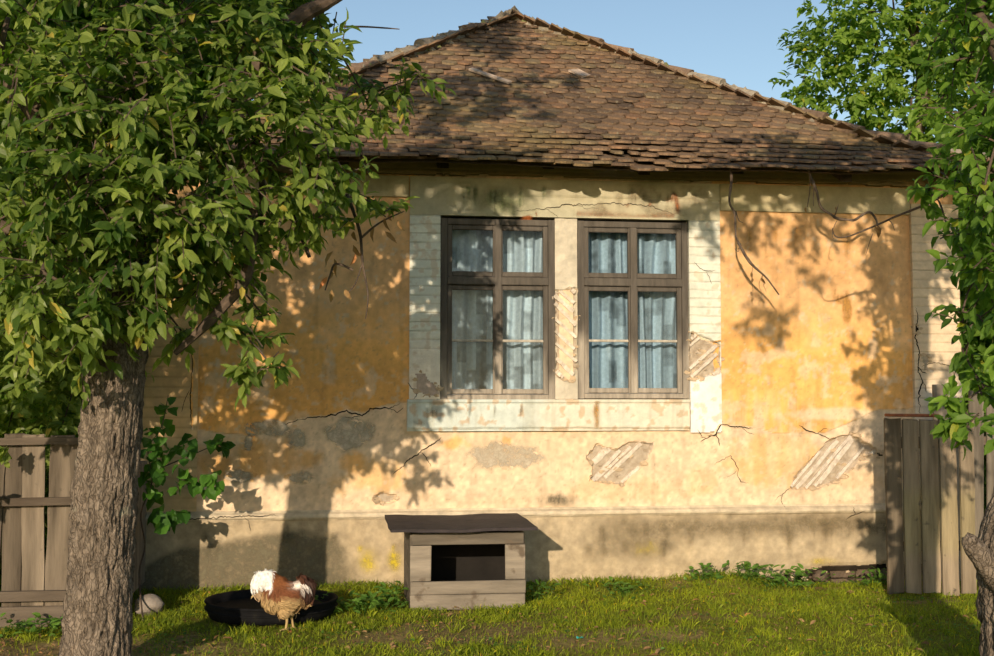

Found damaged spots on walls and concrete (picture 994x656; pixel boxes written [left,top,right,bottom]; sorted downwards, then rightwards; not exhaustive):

crack [527,202,683,217]
spalling [552,286,580,383]
spalling [684,334,725,381]
crack [273,383,417,430]
spalling [412,370,444,397]
crack [799,424,831,439]
crack [393,436,441,474]
spalling [587,441,653,487]
spalling [790,431,884,490]